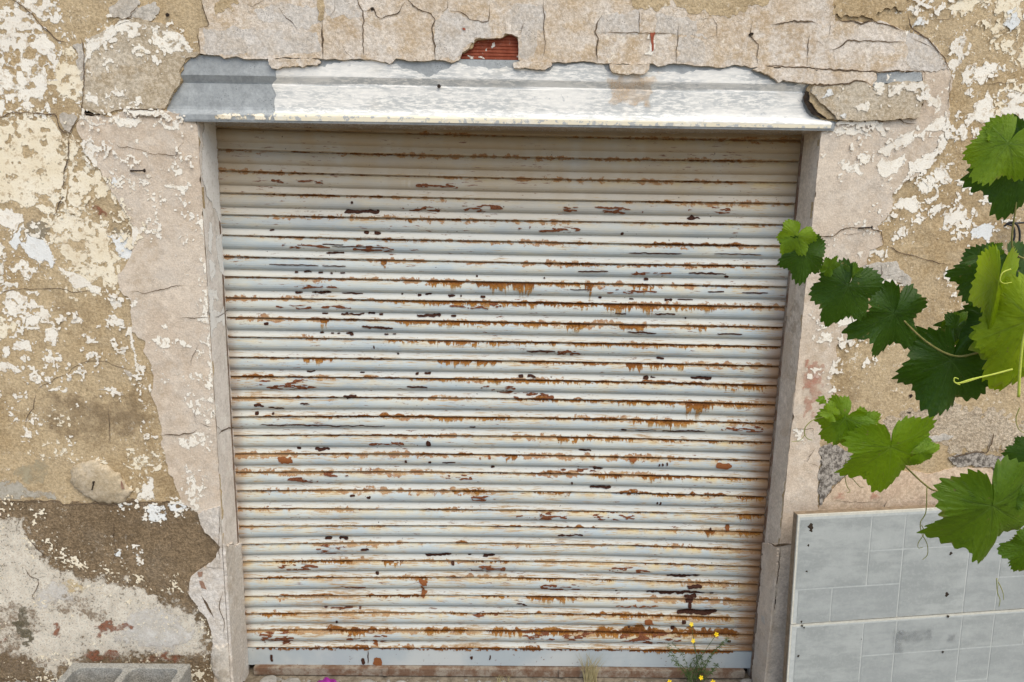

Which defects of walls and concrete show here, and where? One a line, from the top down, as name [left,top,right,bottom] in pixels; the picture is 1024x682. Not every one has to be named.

crack [0,0,160,217]
flaking render [461,35,552,70]
crack [750,11,965,111]
flaking render [752,0,1024,286]
rust [304,196,392,218]
rust [403,204,503,223]
rust [518,226,590,244]
rust [595,200,731,225]
crack [6,286,93,294]
peeling [0,0,249,682]
rust [241,229,778,550]
rust [256,525,739,666]